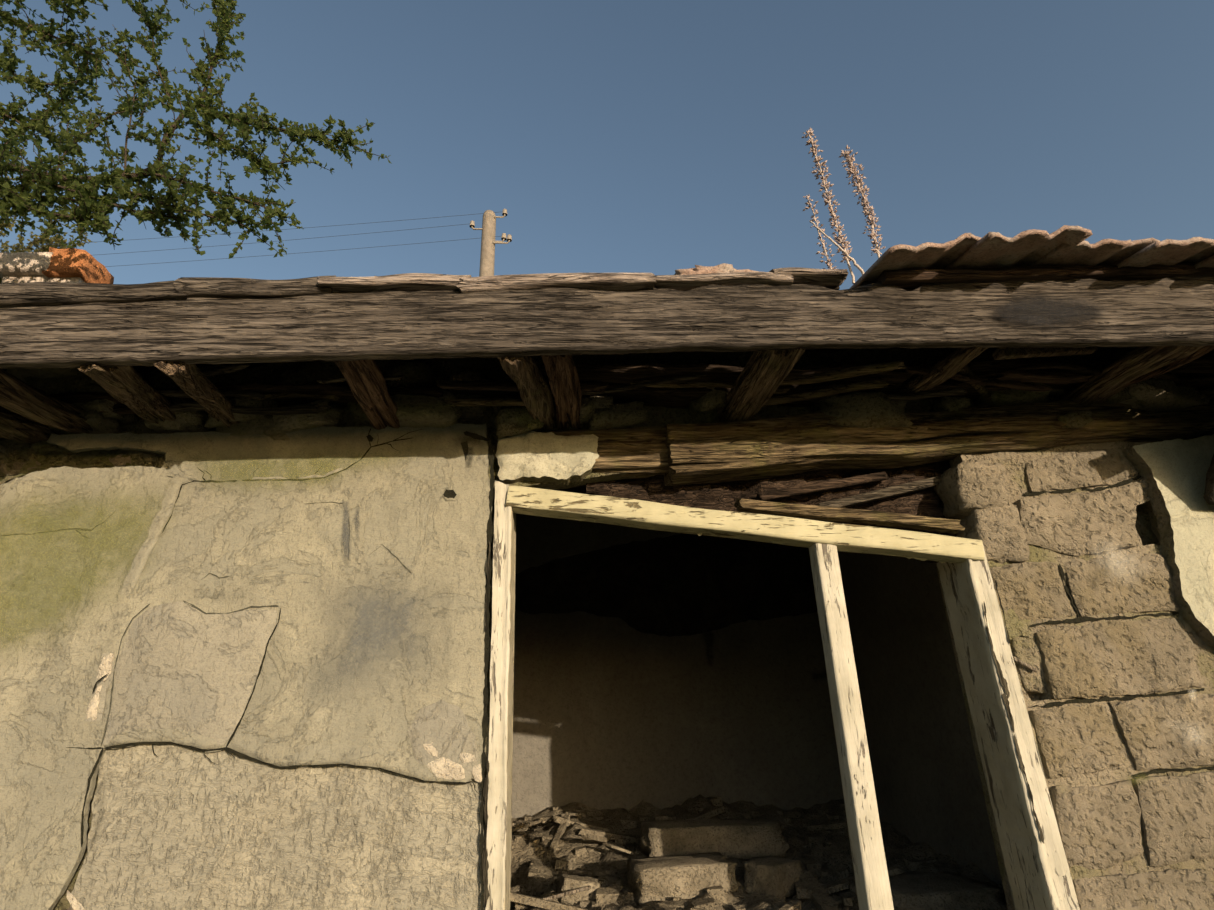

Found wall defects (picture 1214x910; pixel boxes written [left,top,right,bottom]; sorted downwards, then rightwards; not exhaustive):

crack [1,514,112,539]
spalling [1135,505,1159,546]
crack [66,428,494,910]